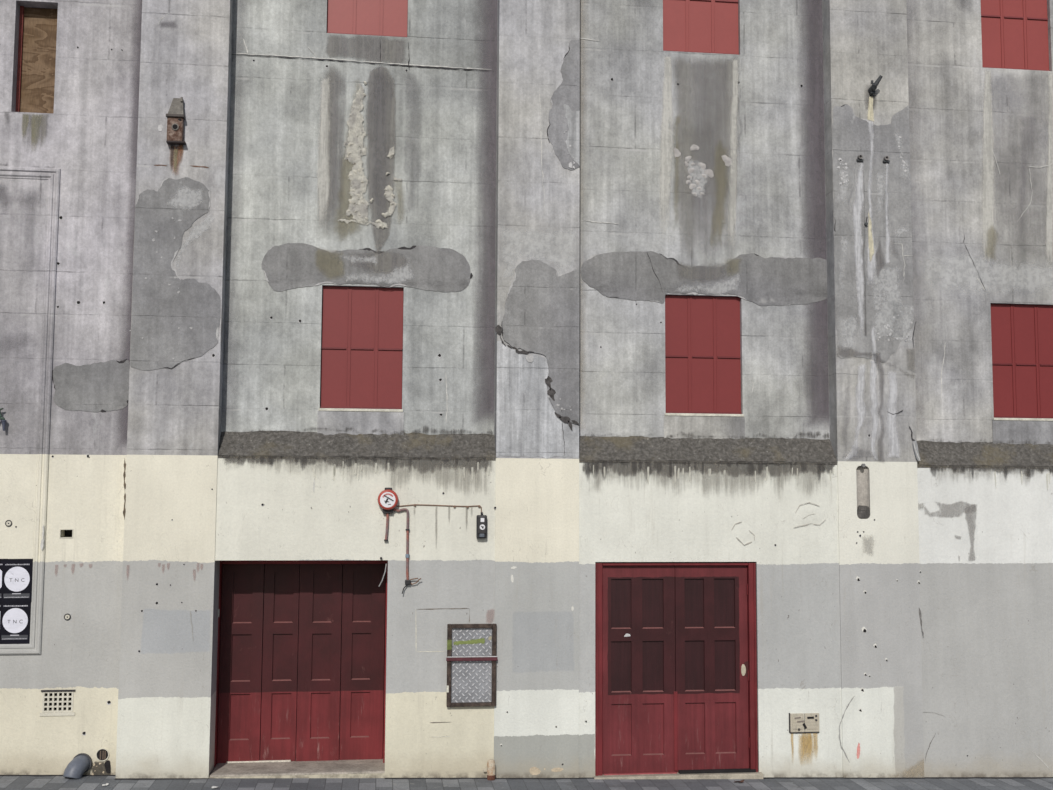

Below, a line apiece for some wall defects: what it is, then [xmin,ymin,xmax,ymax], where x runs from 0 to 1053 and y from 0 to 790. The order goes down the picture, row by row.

flaking render [129,177,221,371]
leakage [318,36,405,272]
flaking render [547,40,580,170]
leakage [660,57,714,213]
leakage [721,60,737,234]
leakage [853,97,889,321]
leakage [226,455,491,480]
flaking render [495,259,579,459]
leakage [838,329,898,460]
leakage [931,465,1053,490]
rust [791,733,817,757]